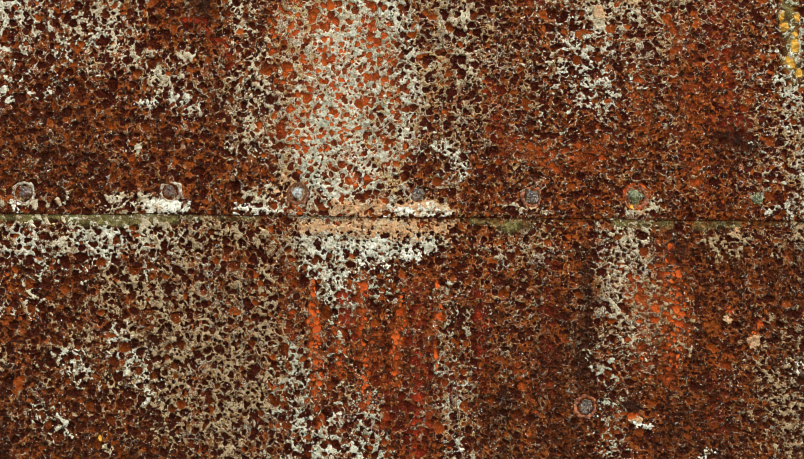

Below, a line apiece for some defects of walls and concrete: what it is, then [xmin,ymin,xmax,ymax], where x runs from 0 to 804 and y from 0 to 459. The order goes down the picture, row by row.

rust [180,1,236,70]
rust [709,0,739,106]
rust [256,0,463,248]
rust [485,84,584,172]
rust [306,279,325,433]
rust [331,276,373,377]
rust [358,357,372,412]
rust [388,277,443,458]
rust [622,399,657,430]
rust [625,242,691,380]
rust [747,320,763,350]